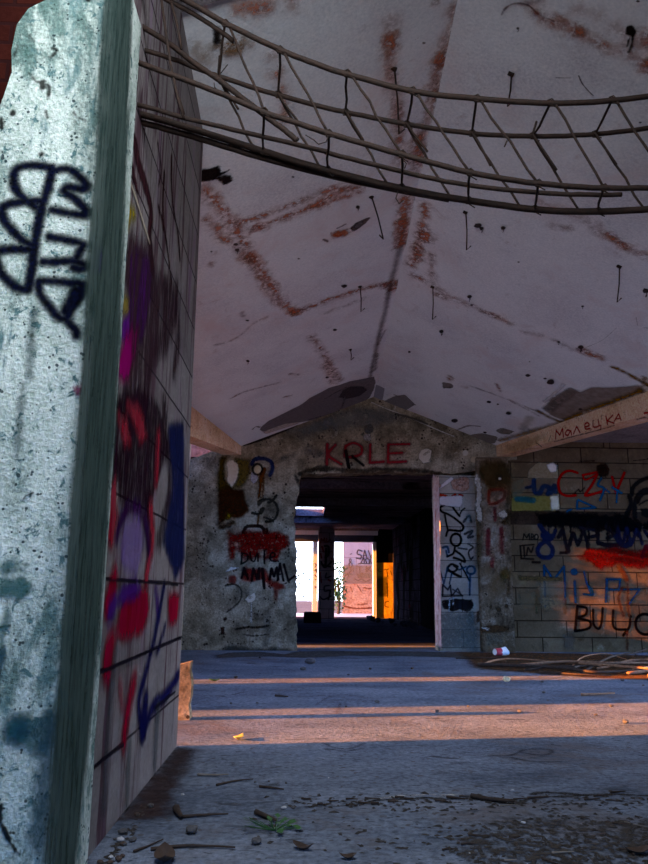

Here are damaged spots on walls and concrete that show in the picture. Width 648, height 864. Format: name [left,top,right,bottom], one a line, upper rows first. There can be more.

corrosion [203,186,398,316]
corrosion [394,196,431,280]
spalling [252,377,415,434]